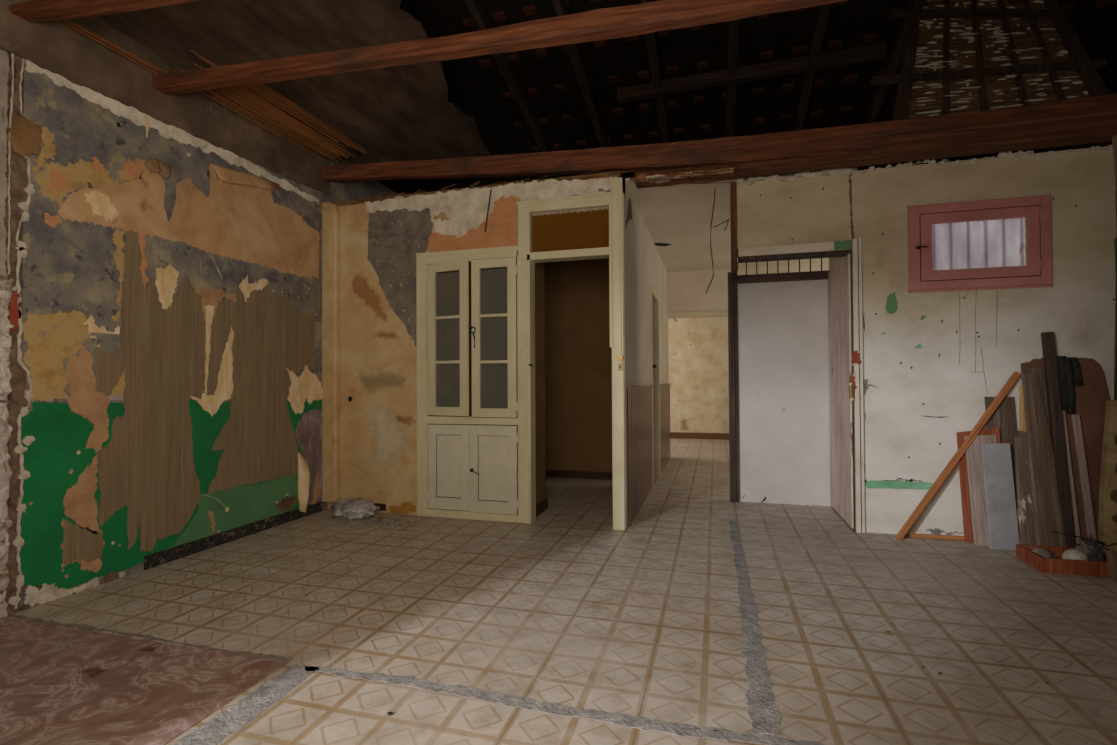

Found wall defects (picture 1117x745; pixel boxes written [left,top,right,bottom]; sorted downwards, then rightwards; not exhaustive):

peeling [32,127,171,228]
flaking render [25,60,319,204]
flaking render [365,145,1113,347]
peeling [19,309,322,609]